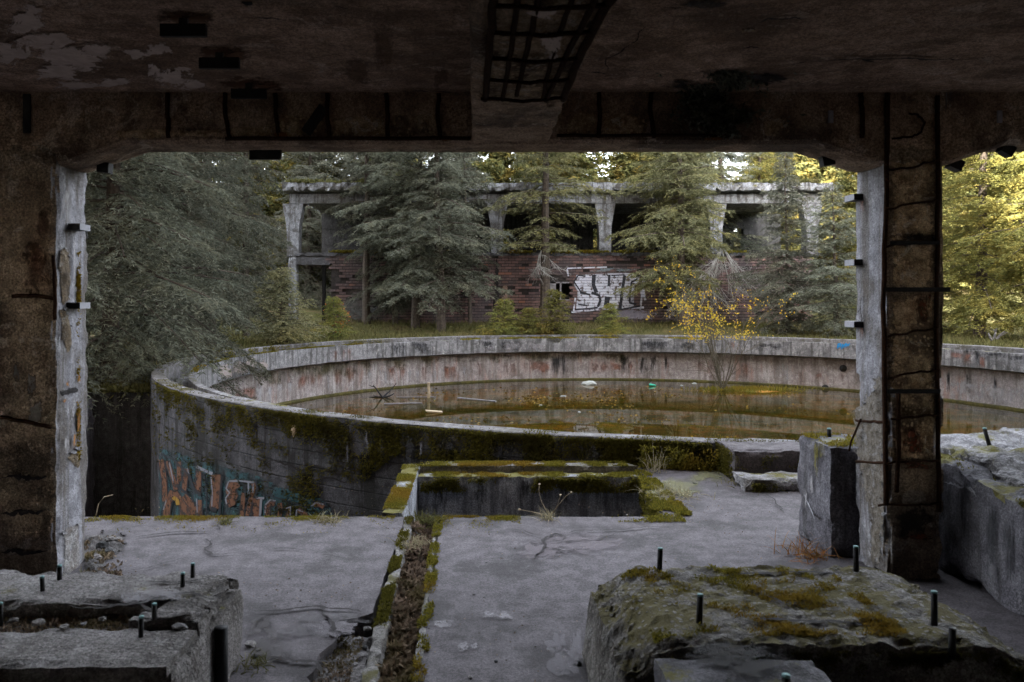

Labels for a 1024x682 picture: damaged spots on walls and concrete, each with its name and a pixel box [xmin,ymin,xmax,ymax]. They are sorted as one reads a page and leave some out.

peeling [0,4,205,91]
spalling [475,0,619,110]
spalling [51,247,75,353]
water stain [361,343,436,383]
water stain [482,341,592,374]
water stain [607,354,627,369]
water stain [640,341,668,372]
crack [509,526,670,561]